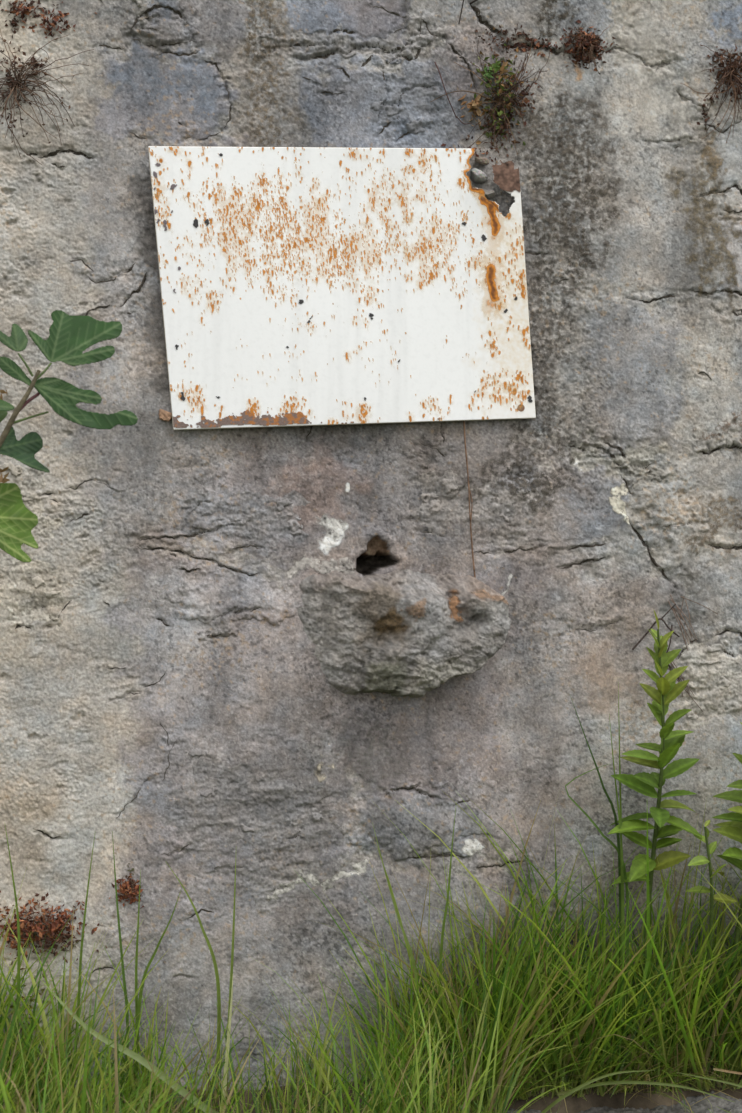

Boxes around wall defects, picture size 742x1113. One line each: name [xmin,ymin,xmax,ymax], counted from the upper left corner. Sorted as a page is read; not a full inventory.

crack [99,5,232,141]
corrosion [149,146,530,384]
crack [633,289,742,316]
corrosion [170,381,223,418]
corrosion [248,396,380,425]
corrosion [409,394,452,422]
corrosion [466,353,530,420]
crack [569,442,742,592]
crack [473,543,606,569]